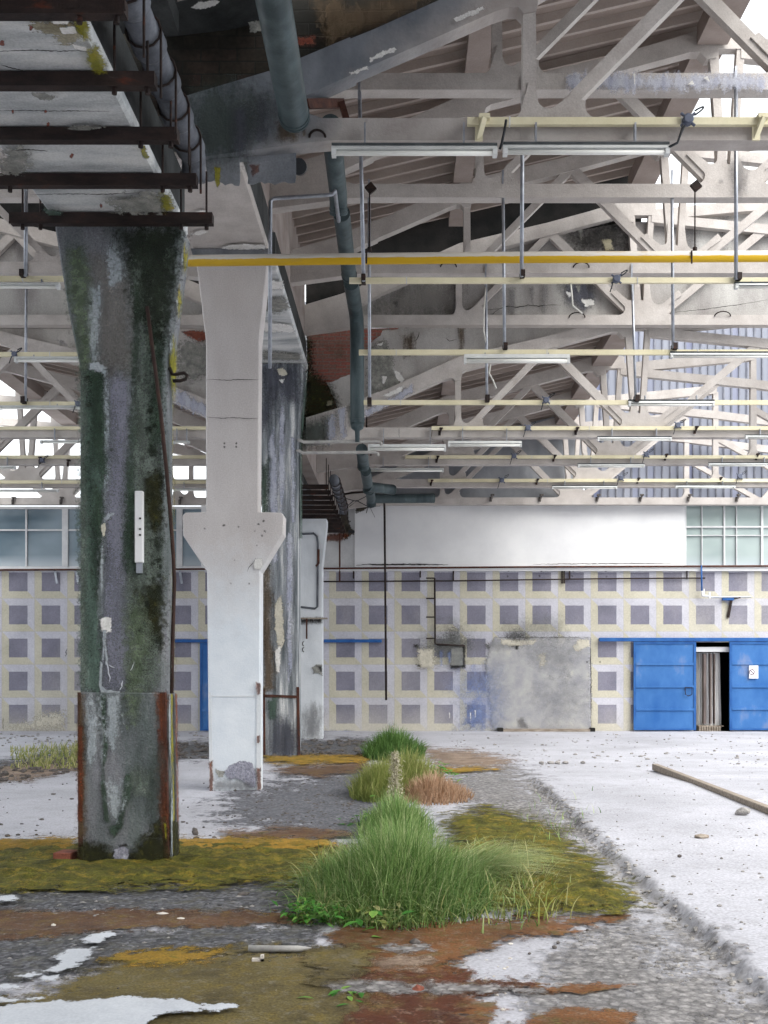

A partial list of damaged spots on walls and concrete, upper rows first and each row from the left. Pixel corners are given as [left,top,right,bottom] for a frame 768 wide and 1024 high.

leakage [63,227,185,764]
leakage [262,336,350,681]
rust [77,694,87,838]
efflorescence [105,781,124,822]
rust [148,693,180,857]
spalling [216,761,257,791]